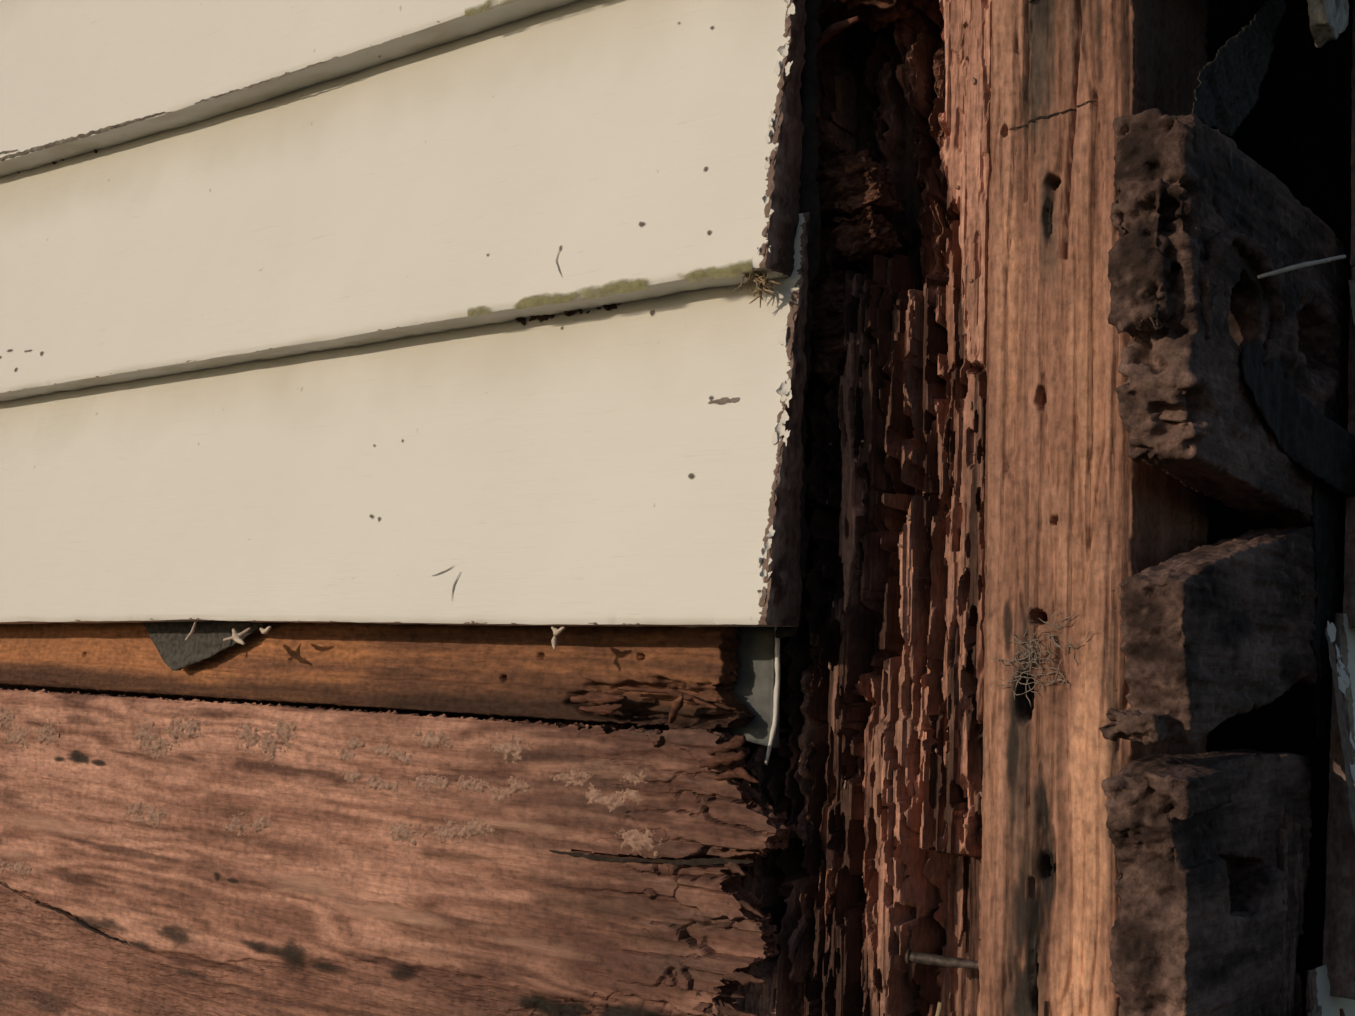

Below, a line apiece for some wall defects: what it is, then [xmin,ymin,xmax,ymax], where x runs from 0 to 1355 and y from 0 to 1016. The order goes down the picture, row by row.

peeling [1325,621,1355,834]
crack [0,882,126,945]
water stain [1013,786,1056,1016]
water stain [520,995,585,1016]
water stain [601,1005,656,1016]